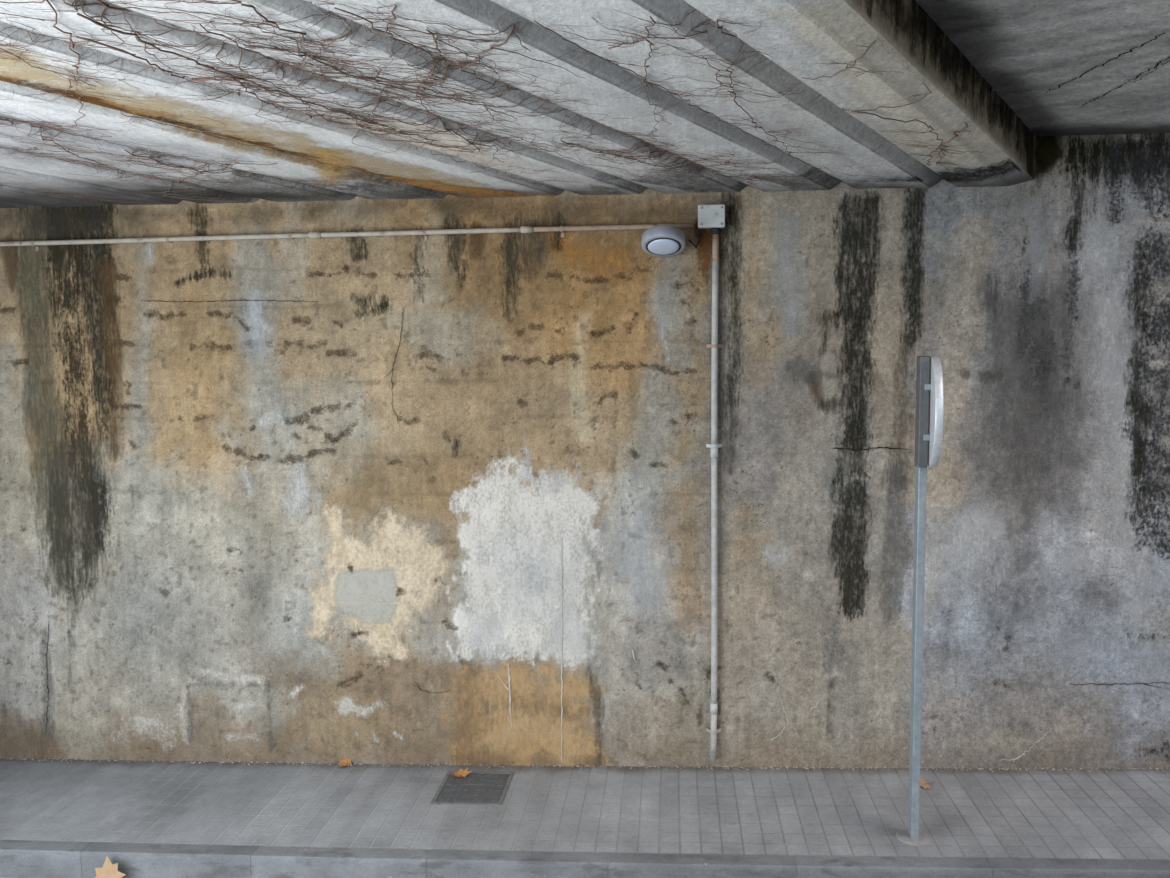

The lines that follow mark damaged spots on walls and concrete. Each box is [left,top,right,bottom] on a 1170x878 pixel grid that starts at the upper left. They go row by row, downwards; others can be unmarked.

leakage [4,202,120,603]
leakage [146,170,352,285]
leakage [788,177,927,619]
leakage [860,0,1034,184]
leakage [989,133,1170,641]
crack [1046,33,1170,105]